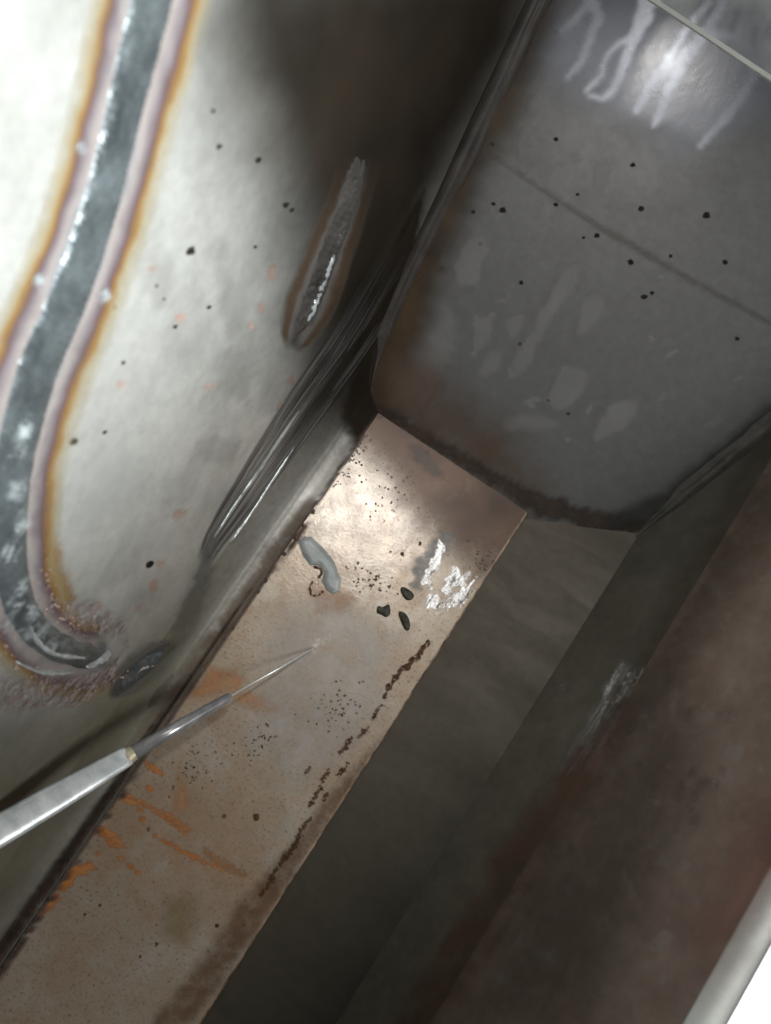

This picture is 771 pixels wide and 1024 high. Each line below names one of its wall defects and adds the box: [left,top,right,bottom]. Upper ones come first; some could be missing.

leakage [558,0,771,147]
corrosion [130,501,313,746]
corrosion [120,755,191,835]
corrosion [40,826,141,916]
corrosion [153,778,353,1024]